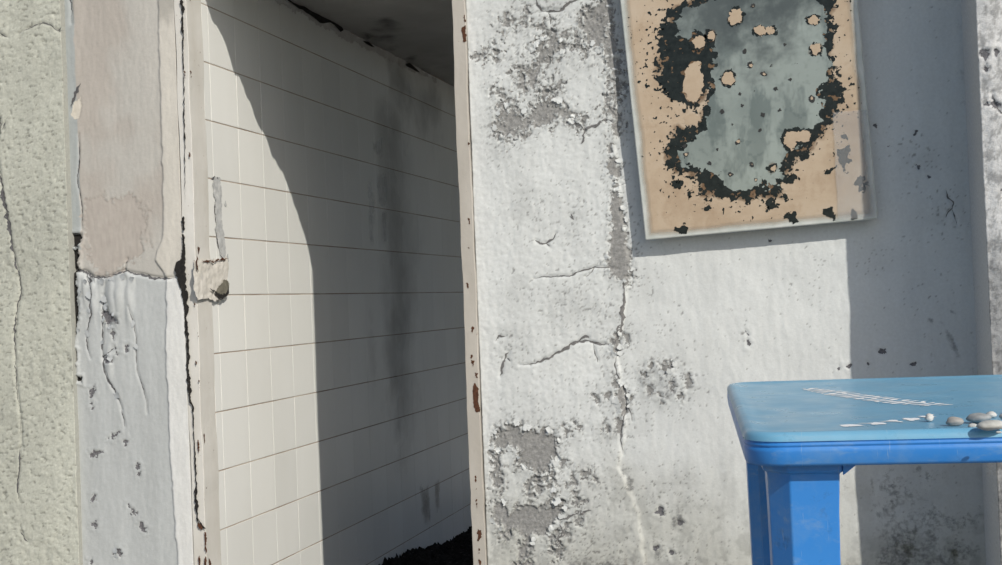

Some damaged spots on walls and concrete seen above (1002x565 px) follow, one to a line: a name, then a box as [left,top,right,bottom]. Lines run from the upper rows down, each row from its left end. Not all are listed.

crack [2,0,73,37]
spalling [174,216,187,315]
peeling [211,176,229,262]
spalling [469,0,637,357]
crack [539,266,611,278]
crack [0,171,22,498]
peeling [100,308,129,363]
rust [470,355,480,412]
crack [496,335,633,449]
spalling [486,420,600,565]